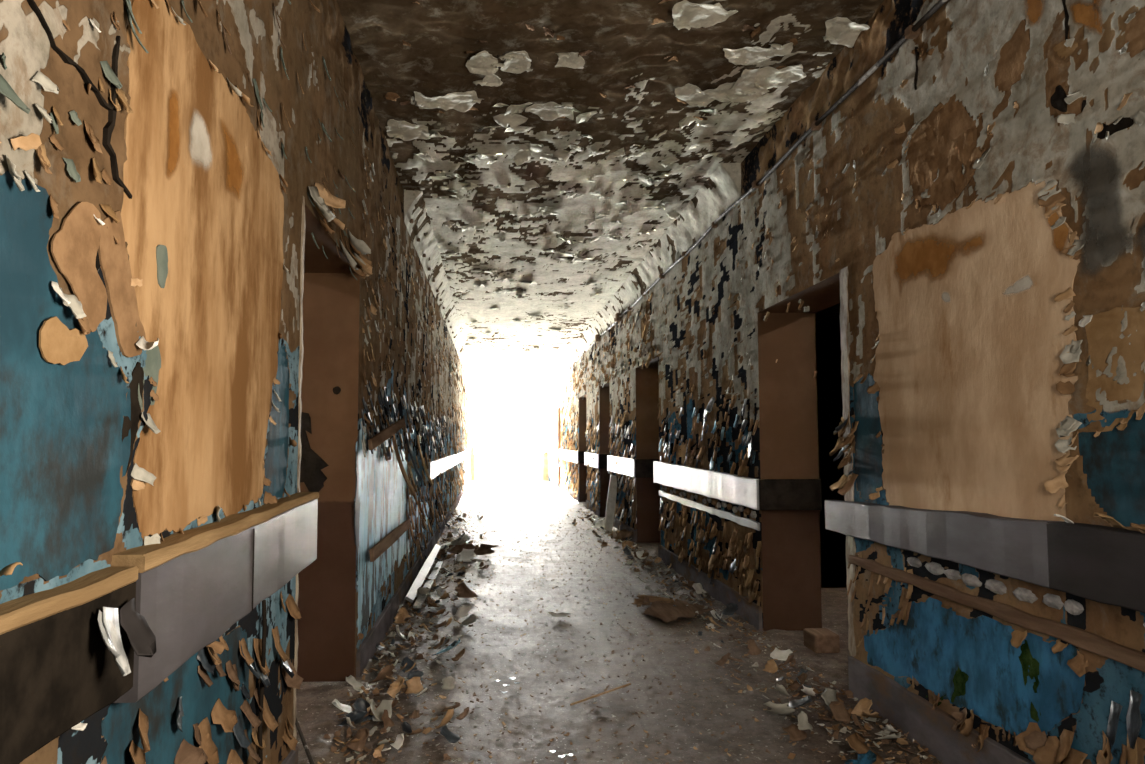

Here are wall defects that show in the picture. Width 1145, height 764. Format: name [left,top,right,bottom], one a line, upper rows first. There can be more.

peeling [385,40,722,264]
peeling [524,23,593,69]
peeling [652,0,806,136]
peeling [823,17,870,48]
peeling [984,20,1030,109]
peeling [1050,82,1086,125]
flaking render [0,0,329,591]
peeling [307,118,513,640]
peeling [559,269,759,531]
flaking render [728,92,1145,534]
peeling [659,498,761,613]
peeling [847,554,1145,764]